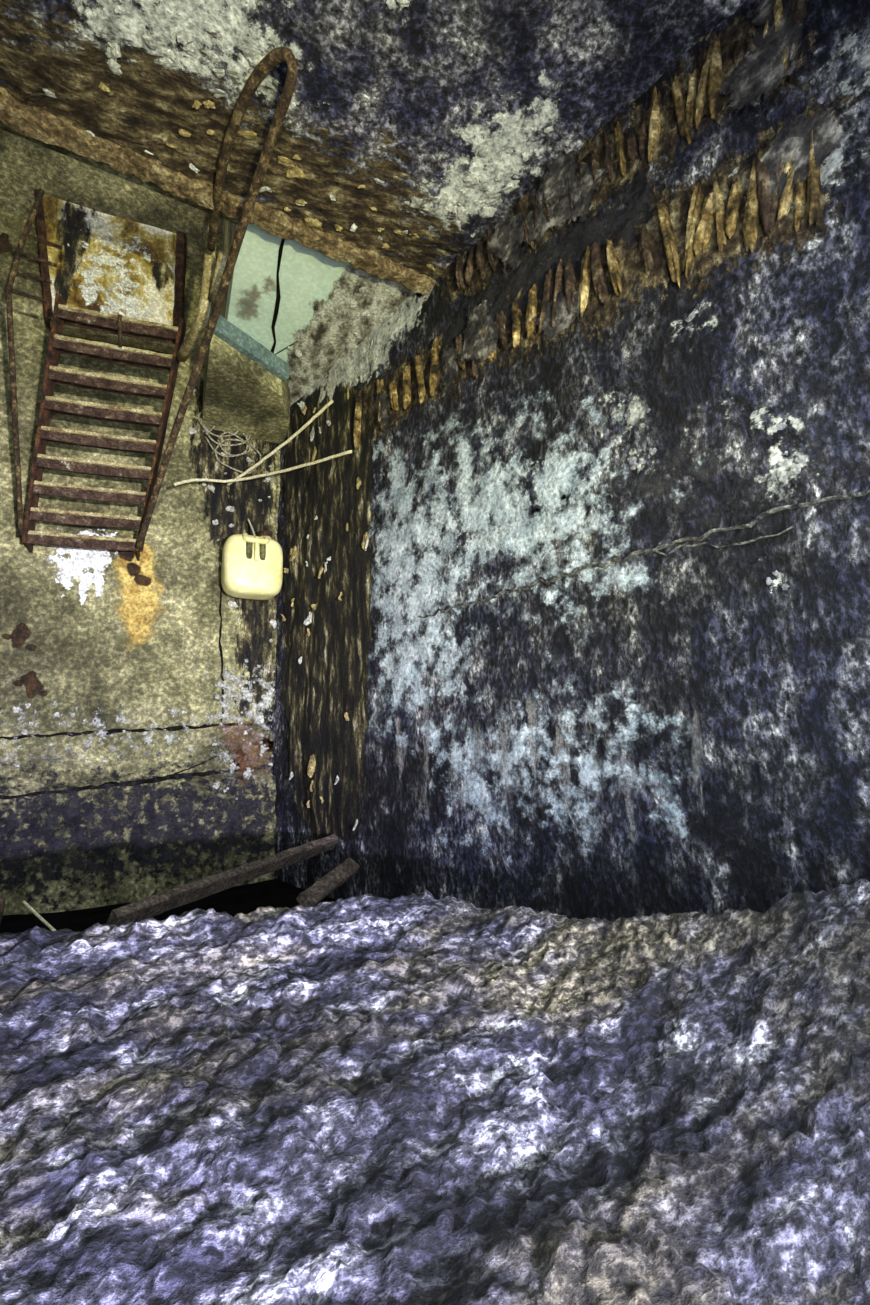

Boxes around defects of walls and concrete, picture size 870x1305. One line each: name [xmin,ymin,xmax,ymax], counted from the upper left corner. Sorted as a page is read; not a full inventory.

corrosion [111,537,163,643]
peeling [0,0,870,841]
leakage [368,403,687,852]
crack [419,487,870,618]